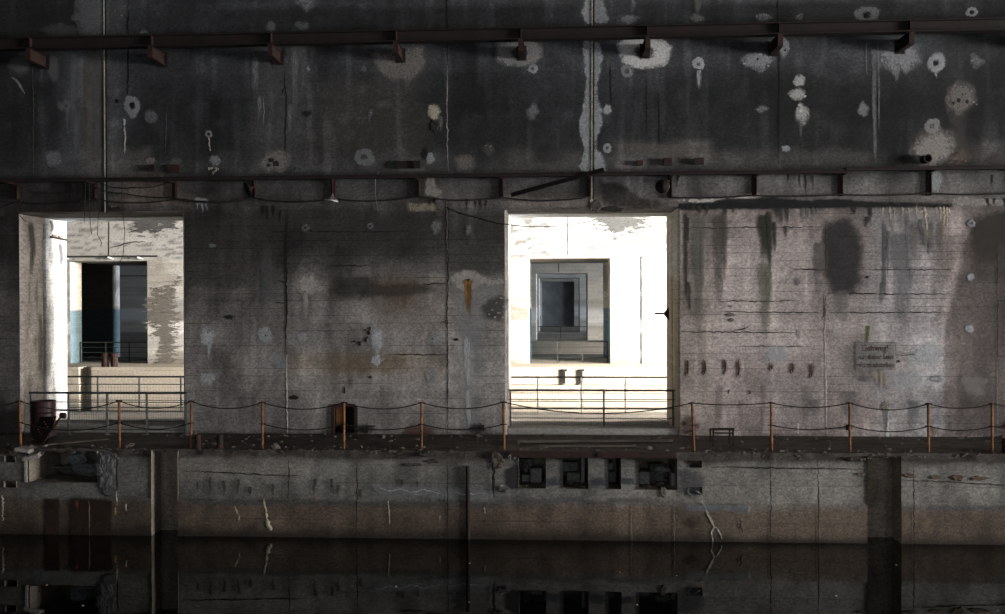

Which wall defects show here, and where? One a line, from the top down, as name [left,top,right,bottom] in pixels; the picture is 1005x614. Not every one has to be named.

leakage [579,40,606,171]
leakage [601,183,660,208]
corrosion [455,270,480,311]
leakage [757,207,789,318]
leakage [813,207,872,293]
leakage [881,223,890,301]